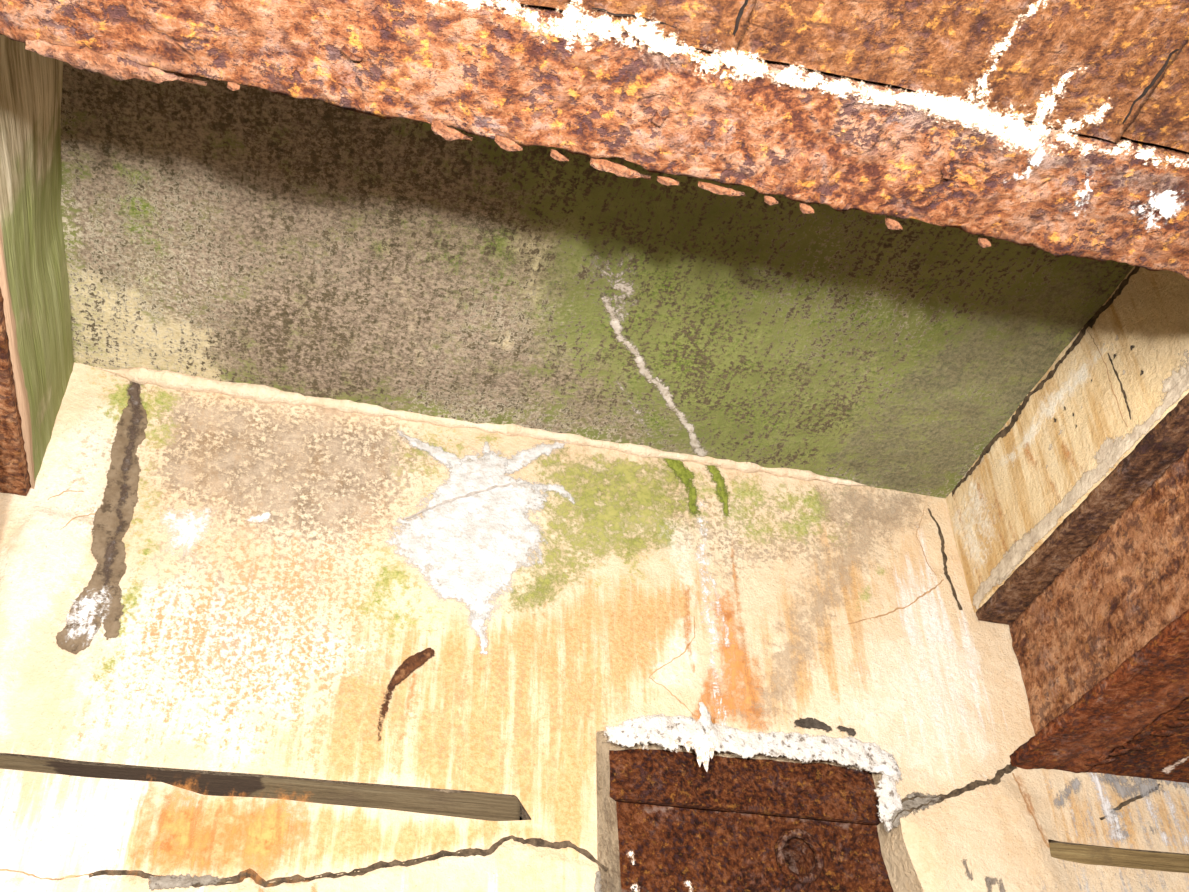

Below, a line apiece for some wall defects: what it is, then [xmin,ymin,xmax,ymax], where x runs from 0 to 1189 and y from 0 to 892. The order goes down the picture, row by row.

corrosion [25,39,208,86]
corrosion [431,120,472,141]
corrosion [495,134,523,151]
corrosion [590,158,679,186]
corrosion [698,181,745,196]
corrosion [885,218,903,230]
crack [848,266,1140,624]
leakage [755,489,920,716]
corrosion [378,647,435,741]
leakage [604,501,903,831]
crack [883,764,1017,833]
crack [0,835,608,892]